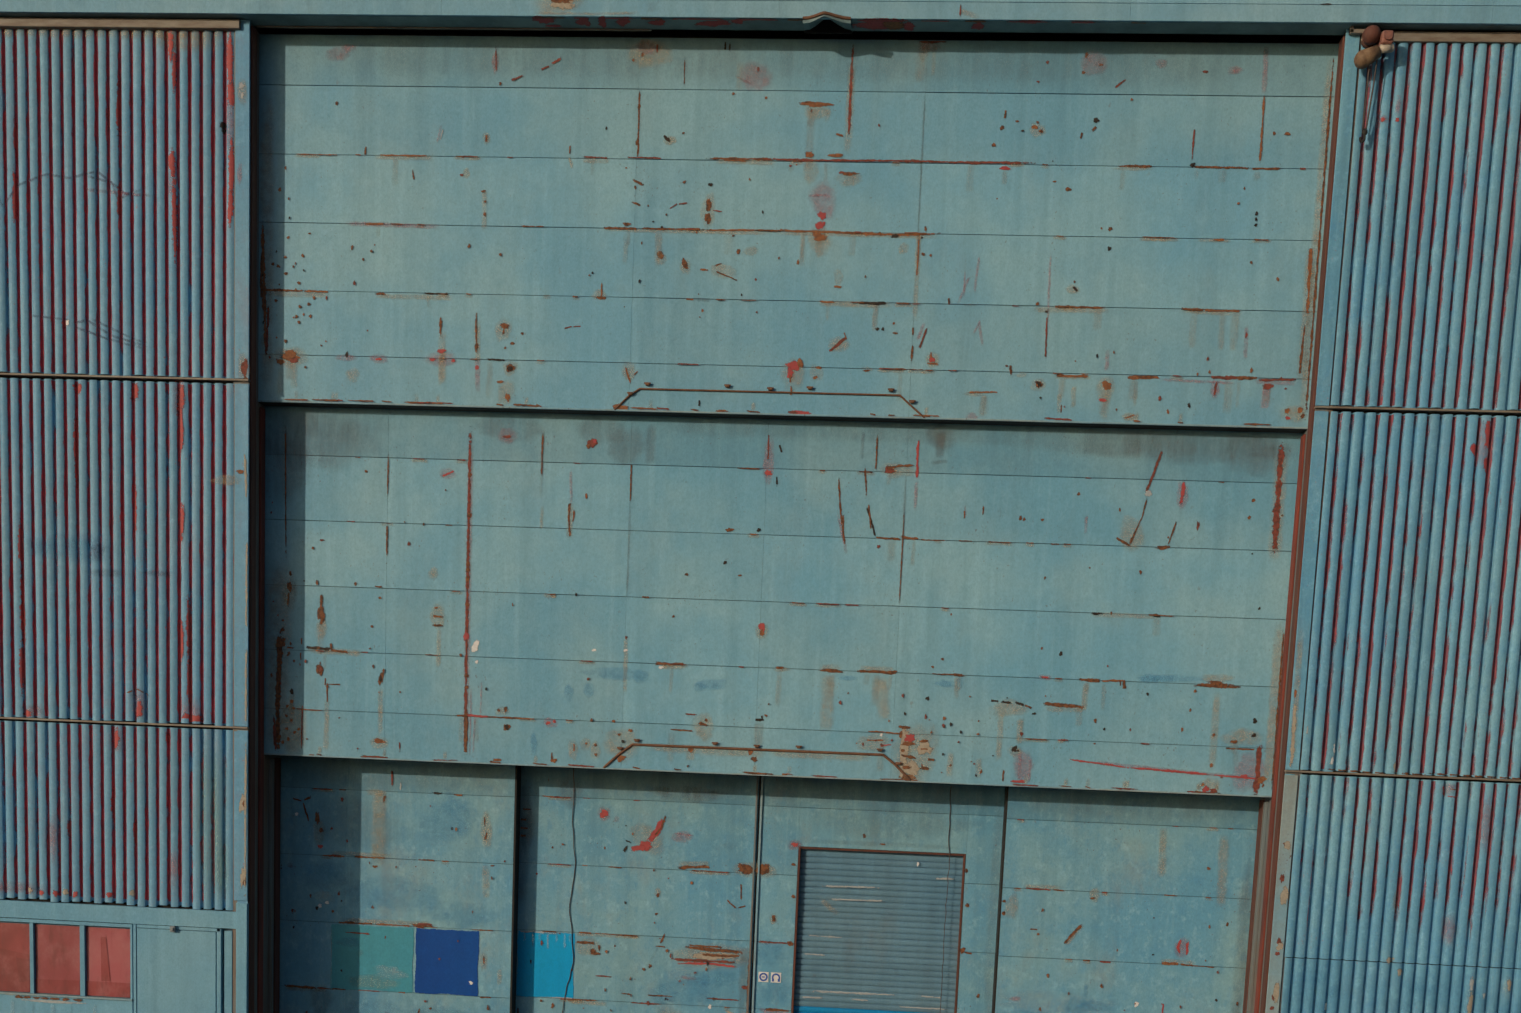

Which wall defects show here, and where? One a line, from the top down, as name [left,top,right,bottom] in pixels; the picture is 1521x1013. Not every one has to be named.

corrosion [852,4,986,31]
corrosion [628,91,661,159]
corrosion [709,152,1048,165]
corrosion [604,222,940,275]
corrosion [430,314,505,370]
corrosion [859,440,919,477]
corrosion [433,434,534,761]
corrosion [273,627,368,751]
peeling [856,694,979,779]
peeling [991,695,1105,745]
peeling [623,816,666,852]
peeling [596,869,742,1005]